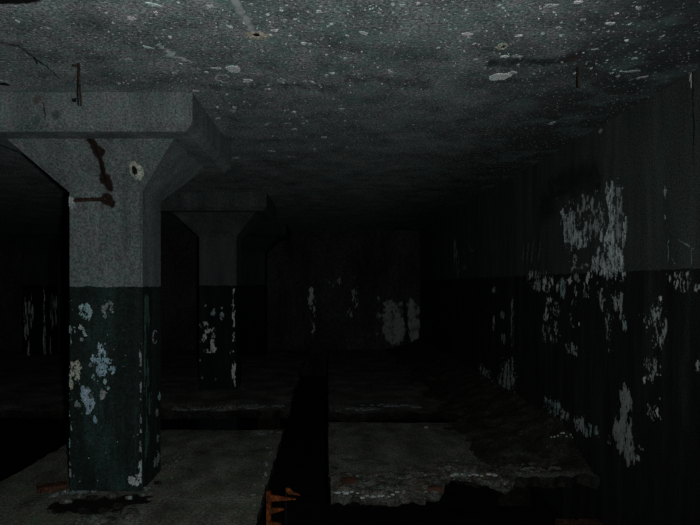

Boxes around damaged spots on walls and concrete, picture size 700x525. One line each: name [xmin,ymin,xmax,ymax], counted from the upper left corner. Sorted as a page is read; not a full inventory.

corrosion [74,138,115,208]
peeling [528,181,627,356]
peeling [69,300,114,345]
peeling [199,288,235,353]
peeling [376,297,420,346]
peeling [69,334,124,423]
peeling [608,382,644,467]